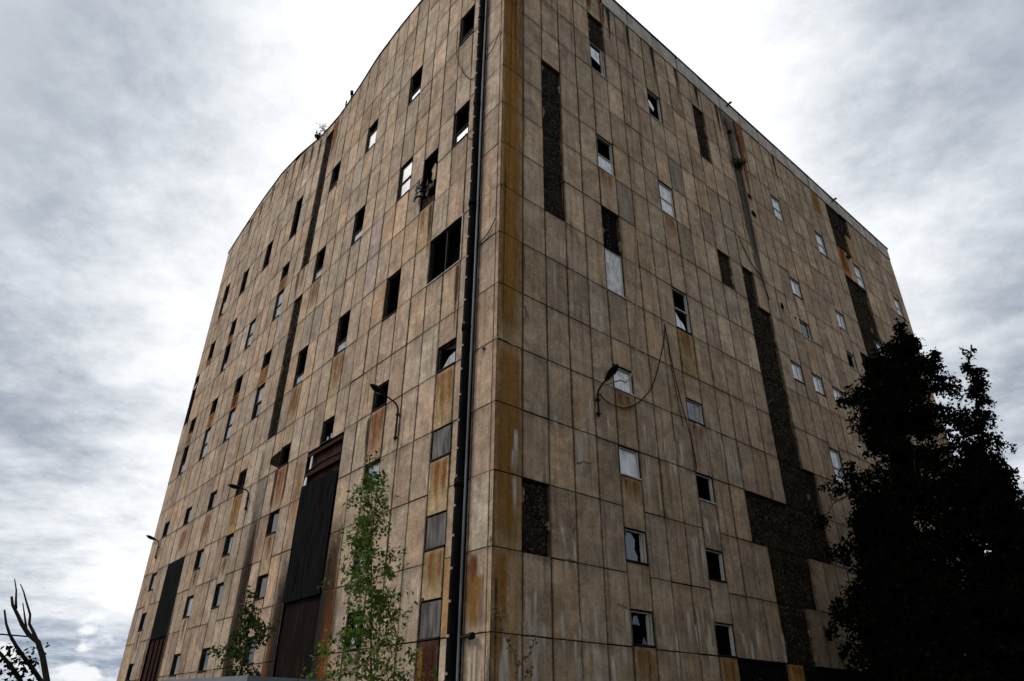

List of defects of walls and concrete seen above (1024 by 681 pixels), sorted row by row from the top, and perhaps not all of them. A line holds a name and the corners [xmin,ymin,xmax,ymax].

corrosion [502,0,522,322]
peeling [541,64,564,221]
corrosion [732,120,750,192]
corrosion [270,466,300,509]
corrosion [364,409,383,463]
corrosion [498,353,521,533]
peeling [521,480,550,557]
peeling [717,253,882,681]
corrosion [261,565,287,677]
corrosion [468,555,481,622]